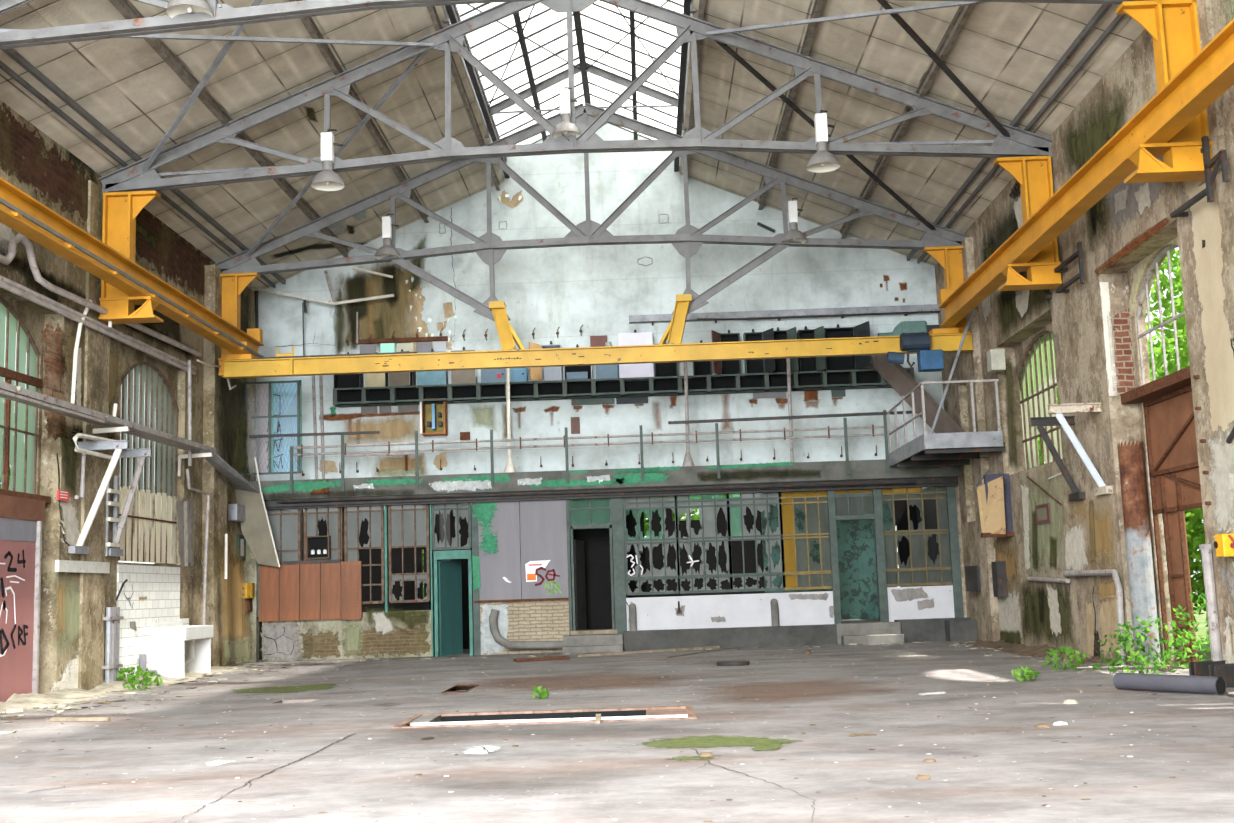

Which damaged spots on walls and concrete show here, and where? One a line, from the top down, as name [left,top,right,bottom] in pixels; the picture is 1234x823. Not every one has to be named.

peeling [1207,431,1234,534]
spalling [301,624,430,660]
peeling [1219,557,1234,664]